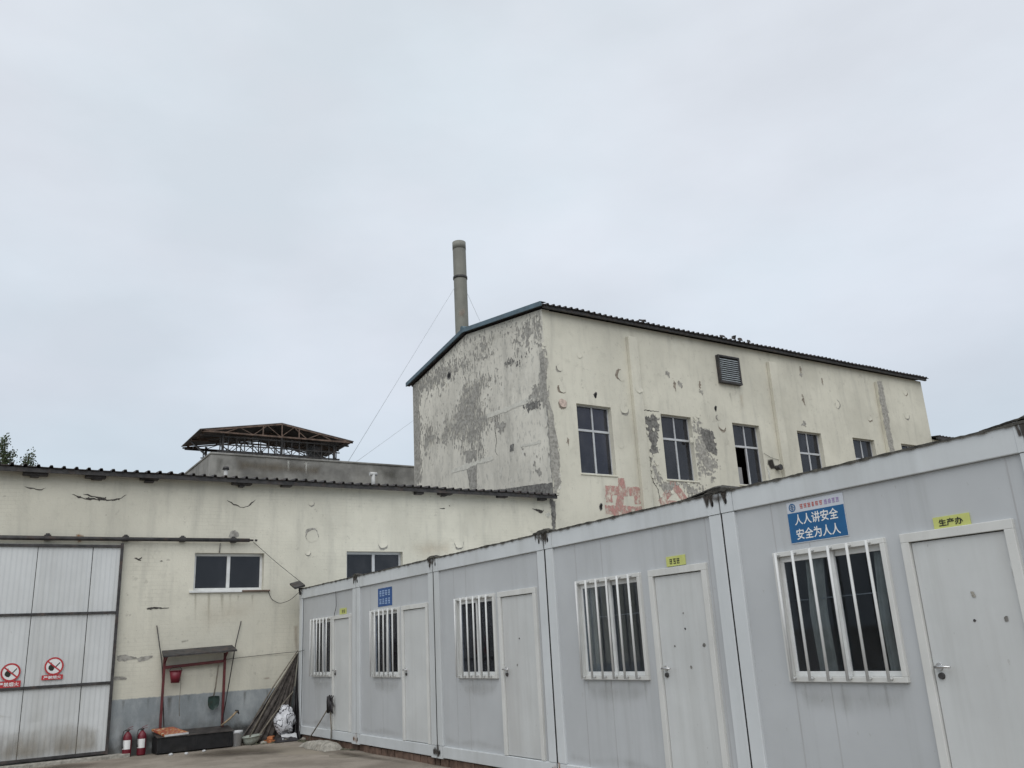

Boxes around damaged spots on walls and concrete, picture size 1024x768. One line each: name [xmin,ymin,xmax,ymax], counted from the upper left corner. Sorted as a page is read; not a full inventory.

crack [72,493,125,501]
peeling [413,313,569,529]
peeling [645,406,726,498]
peeling [867,380,895,452]